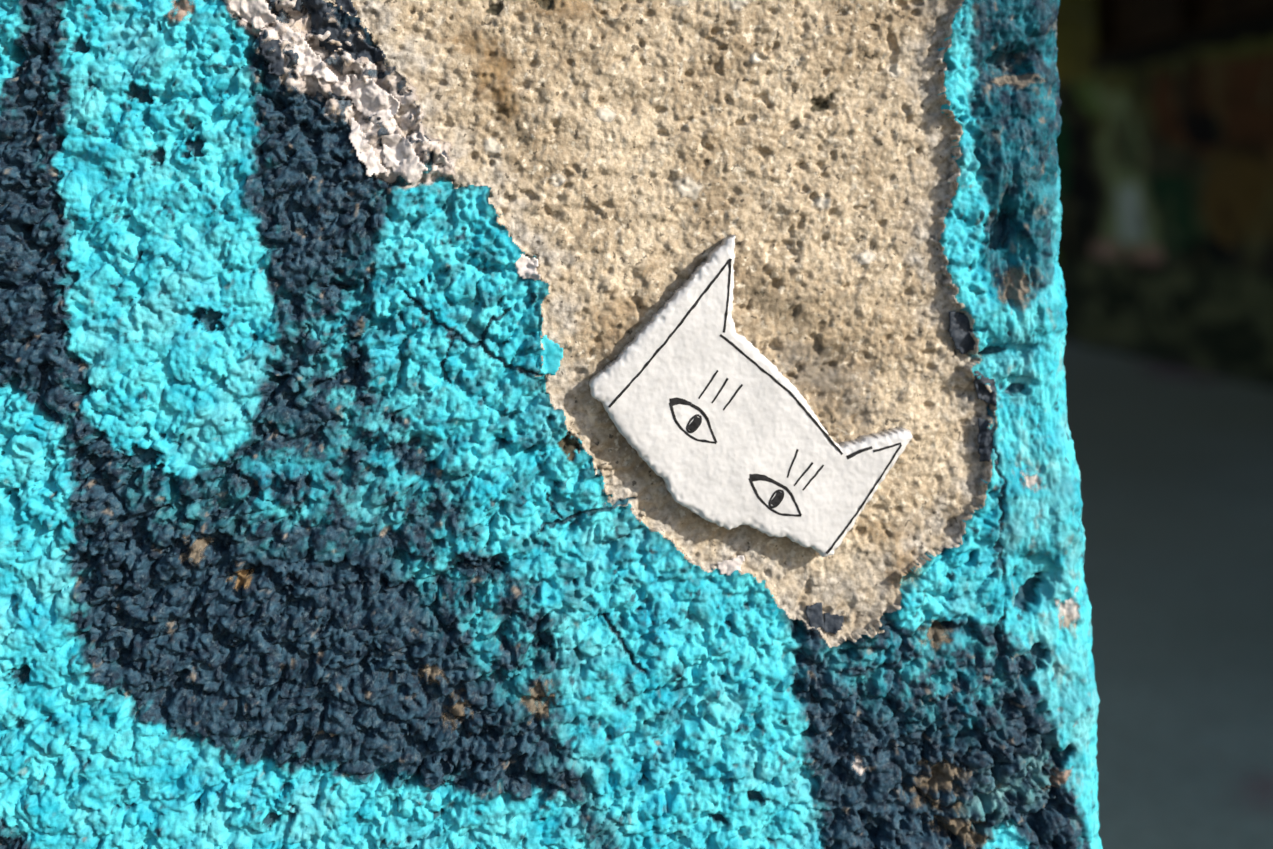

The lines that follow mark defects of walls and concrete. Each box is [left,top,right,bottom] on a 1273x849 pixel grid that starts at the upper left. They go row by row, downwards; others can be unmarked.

peeling [167,0,194,23]
spalling [149,148,165,166]
spalling [181,136,204,158]
spalling [193,308,225,331]
crack [404,290,542,383]
flaking render [224,0,998,649]
crack [986,404,1007,575]
peeling [180,536,211,564]
crack [994,609,1006,643]